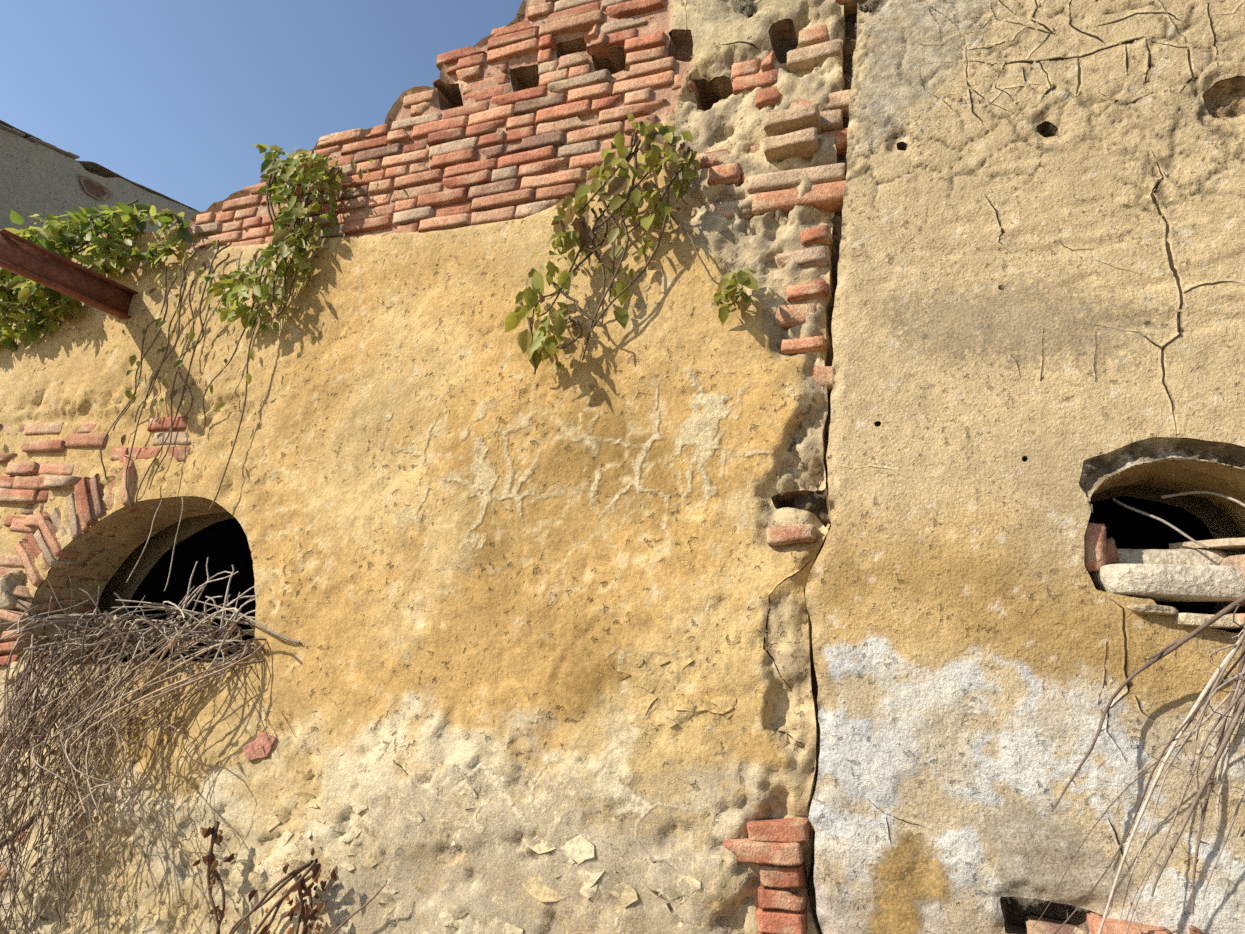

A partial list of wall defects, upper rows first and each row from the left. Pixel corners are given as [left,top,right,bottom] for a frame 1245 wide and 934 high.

spalling [668,29,693,62]
crack [720,39,760,51]
flaking render [730,0,758,18]
flaking render [768,15,799,63]
crack [838,13,857,174]
crack [886,0,1245,131]
flaking render [1202,76,1245,120]
crack [1007,150,1245,434]
crack [794,212,899,525]
water stain [380,367,773,568]